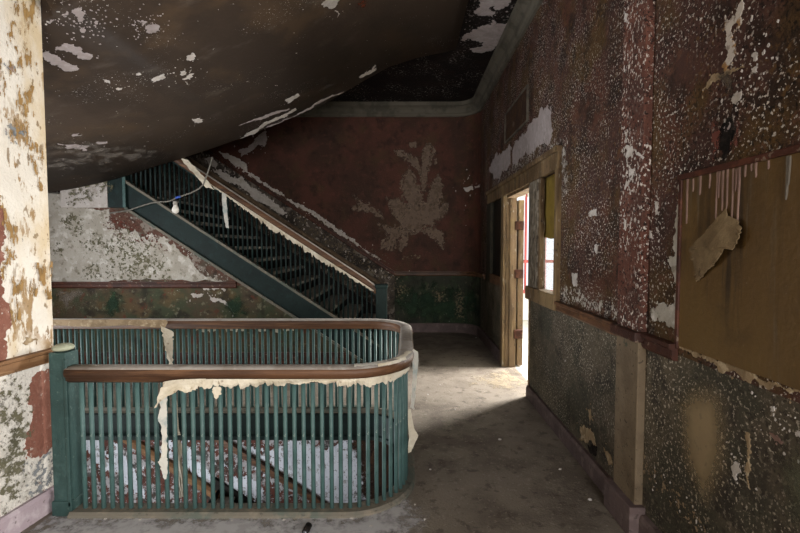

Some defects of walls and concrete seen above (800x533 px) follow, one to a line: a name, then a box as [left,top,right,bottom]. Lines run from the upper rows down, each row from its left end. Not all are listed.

peeling [462,0,511,53]
flaking render [0,205,14,361]
peeling [0,0,223,297]
peeling [53,319,174,364]
peeling [182,94,409,300]
peeling [487,99,585,195]
peeling [561,269,617,320]
peeling [649,178,679,334]
damp [692,160,770,221]
flaking render [23,369,53,500]
peeling [86,440,145,498]
peeling [153,349,418,503]